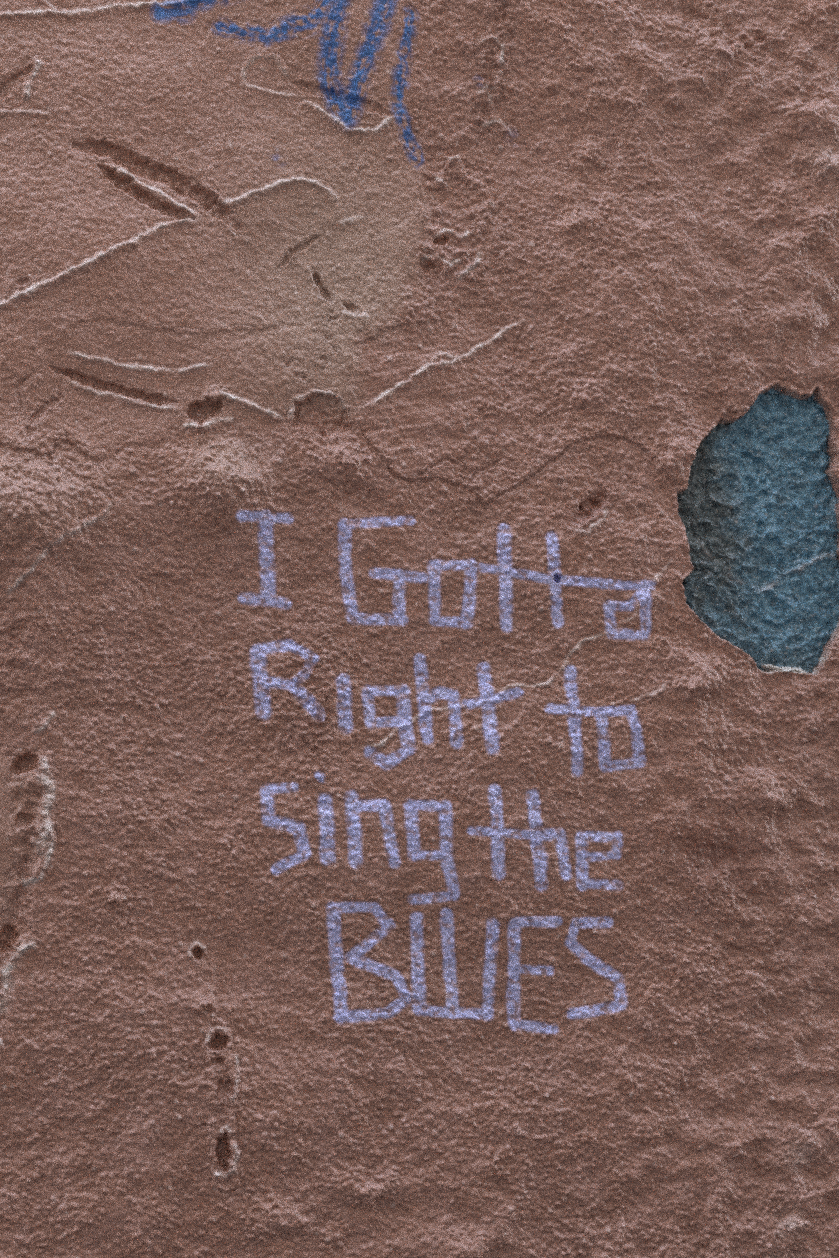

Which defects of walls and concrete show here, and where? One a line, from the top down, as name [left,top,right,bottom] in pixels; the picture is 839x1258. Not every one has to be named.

crack [357,430,679,511]
flaking render [670,377,839,682]